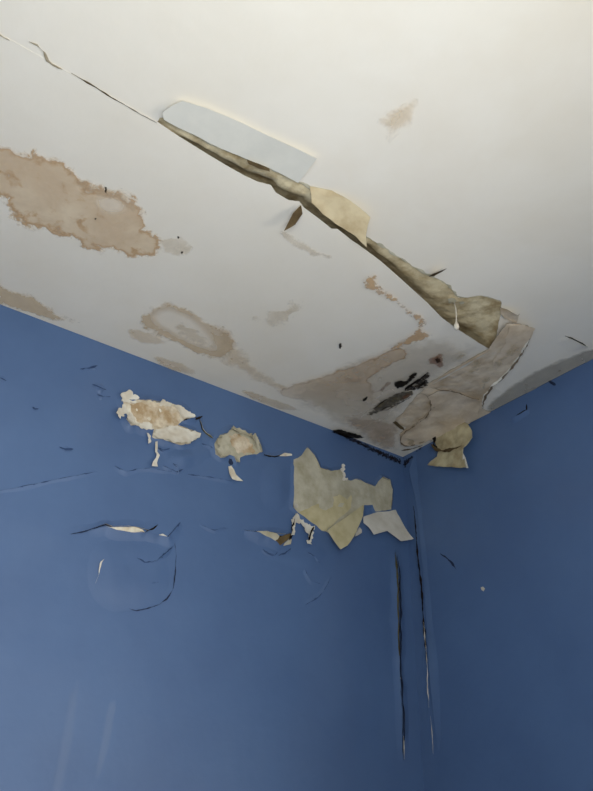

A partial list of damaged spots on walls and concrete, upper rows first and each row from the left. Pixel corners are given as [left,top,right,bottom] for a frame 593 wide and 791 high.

crack [29,41,157,123]
leakage [0,149,160,257]
peeling [284,205,303,231]
leakage [363,276,397,301]
leakage [318,312,428,382]
leakage [367,372,429,415]
peeling [116,390,265,481]
leakage [333,429,421,468]
peeling [289,308,535,754]
crack [389,550,409,761]